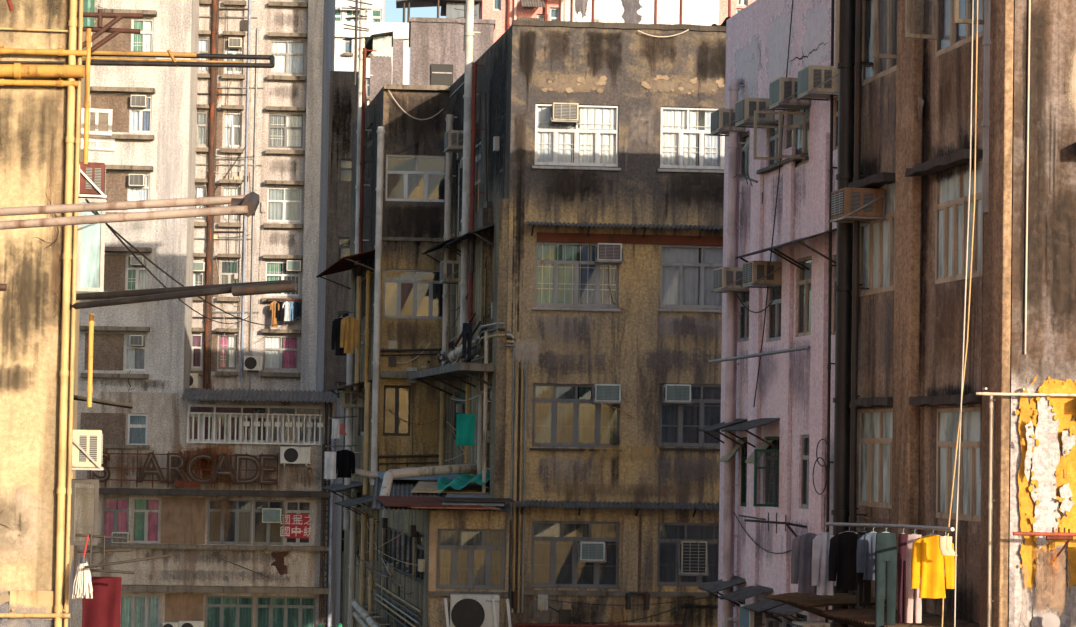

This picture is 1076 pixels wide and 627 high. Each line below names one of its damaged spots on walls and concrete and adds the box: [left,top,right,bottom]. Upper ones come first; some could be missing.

leakage [520,31,574,92]
peeling [534,72,607,94]
leakage [586,20,622,76]
leakage [641,34,676,66]
crack [790,42,827,63]
leakage [488,41,526,288]
leakage [548,170,610,202]
leakage [3,247,63,346]
leakage [512,301,605,372]
leakage [0,366,27,389]
rust [178,446,231,481]
peeling [1015,376,1076,615]